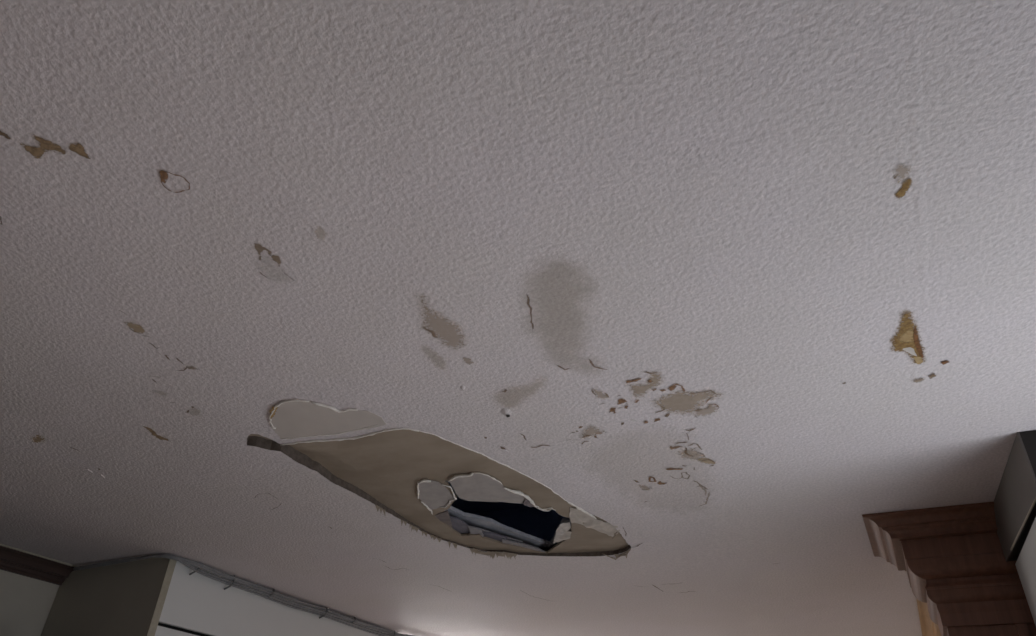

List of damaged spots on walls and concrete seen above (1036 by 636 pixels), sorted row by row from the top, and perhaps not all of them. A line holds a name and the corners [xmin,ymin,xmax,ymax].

spalling [891,311,925,364]
peeling [592,372,719,425]
peeling [572,426,604,444]
flaking render [419,473,526,510]
peeling [634,429,715,506]